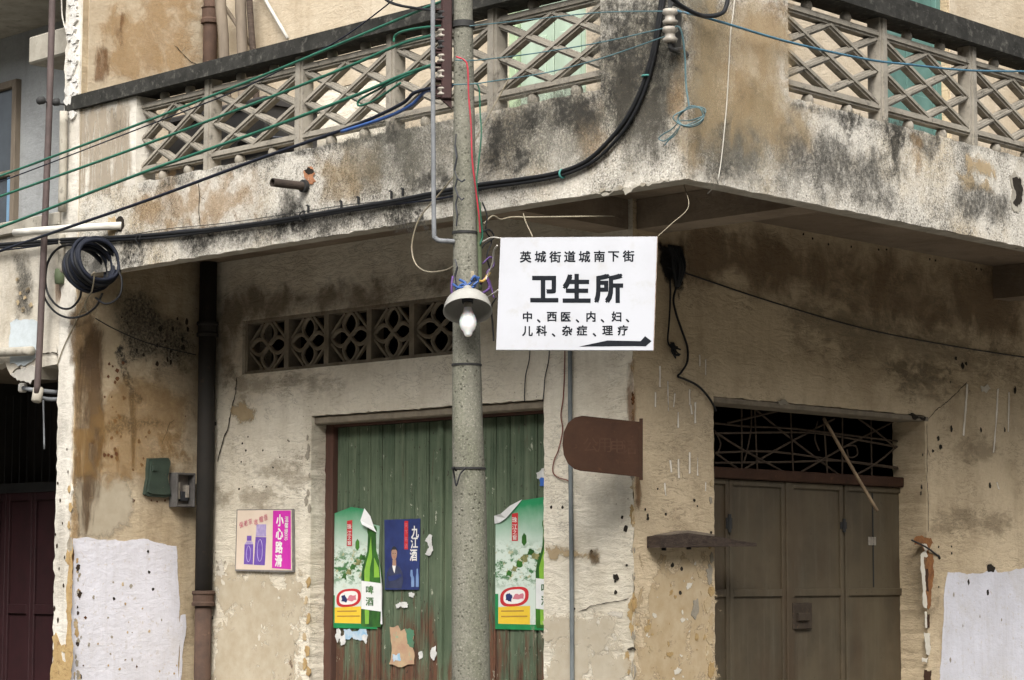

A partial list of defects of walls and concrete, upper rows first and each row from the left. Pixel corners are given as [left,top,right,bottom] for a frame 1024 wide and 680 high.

leakage [482,0,680,174]
leakage [784,107,940,208]
leakage [956,142,1008,223]
leakage [76,321,104,533]
leakage [117,293,192,454]
crack [217,378,237,462]
peeling [50,471,99,680]
peeling [541,547,718,680]
rust [914,535,934,680]